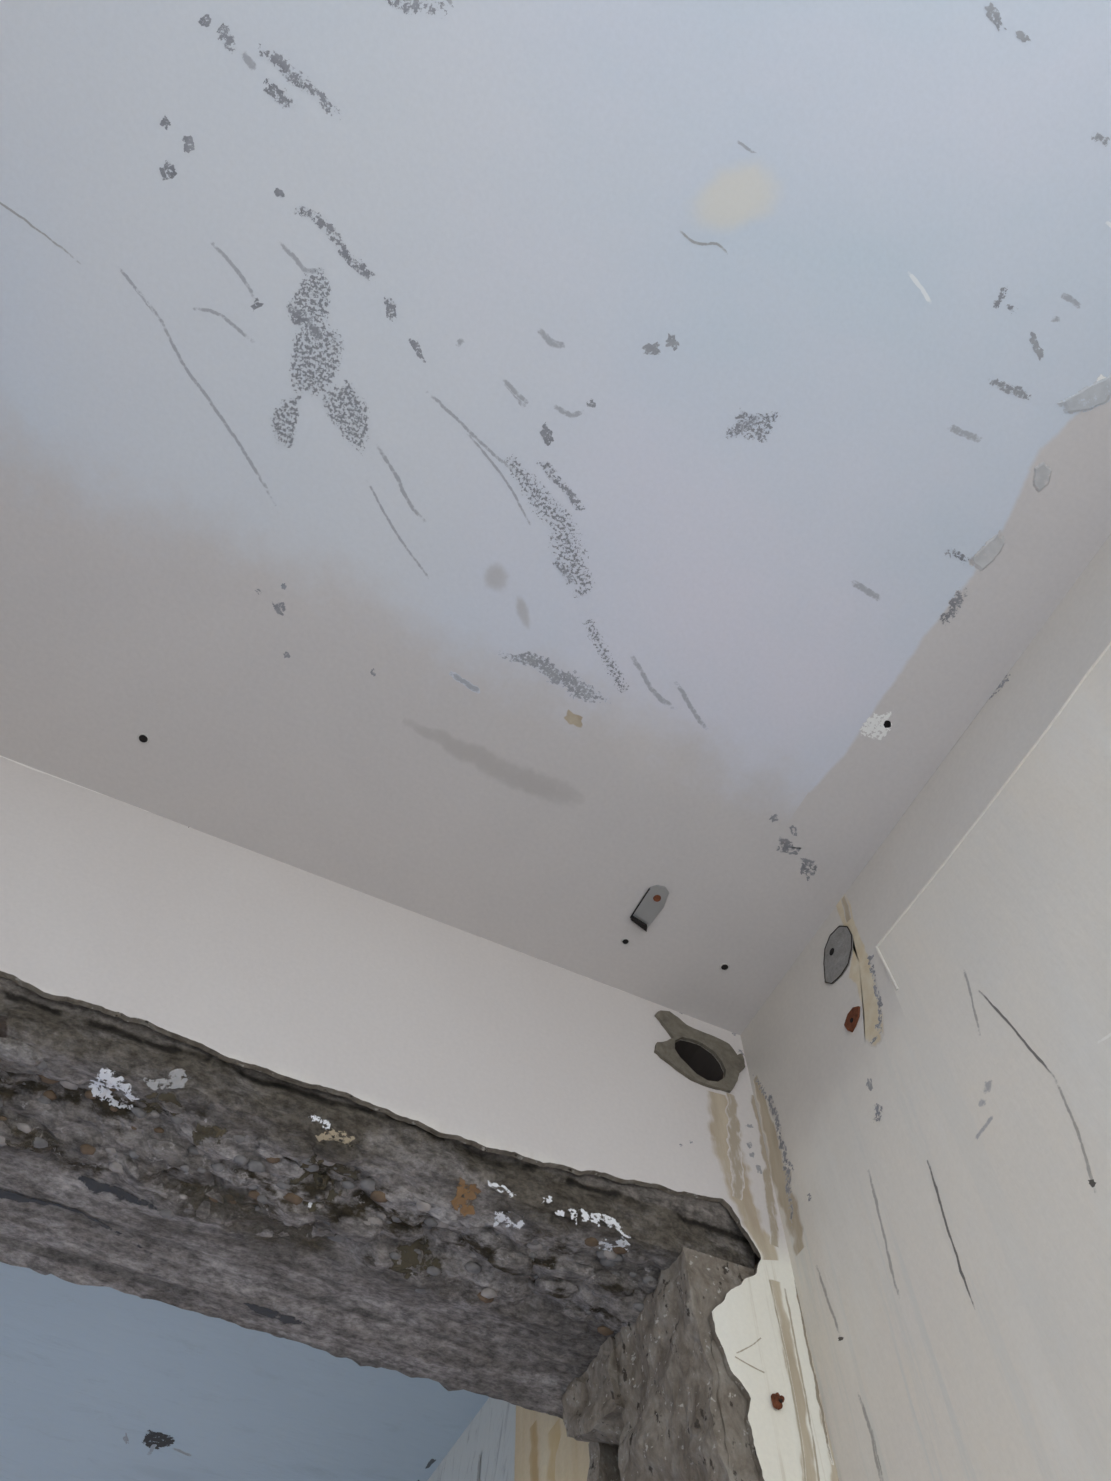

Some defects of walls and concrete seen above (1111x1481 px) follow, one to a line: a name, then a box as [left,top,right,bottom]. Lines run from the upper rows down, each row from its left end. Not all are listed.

water stain [680,152,791,239]
crack [0,202,82,265]
spalling [137,1091,182,1116]
crack [963,969,1097,1194]
spalling [192,1123,228,1147]
spalling [290,1154,360,1212]
spalling [386,1238,442,1280]
spalling [123,1430,192,1457]